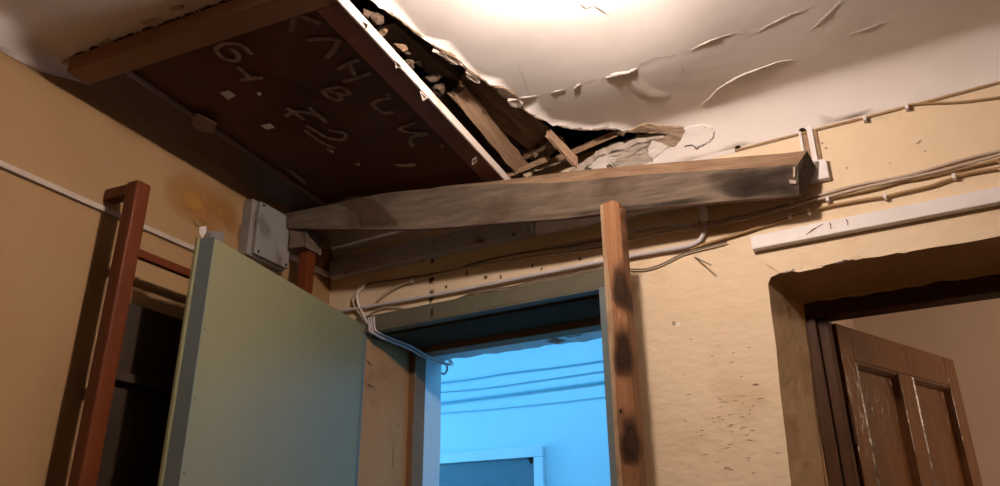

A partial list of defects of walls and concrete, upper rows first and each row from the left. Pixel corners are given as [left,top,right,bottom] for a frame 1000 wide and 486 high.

flaking render [432,49,480,83]
flaking render [508,98,524,108]
flaking render [588,122,715,169]